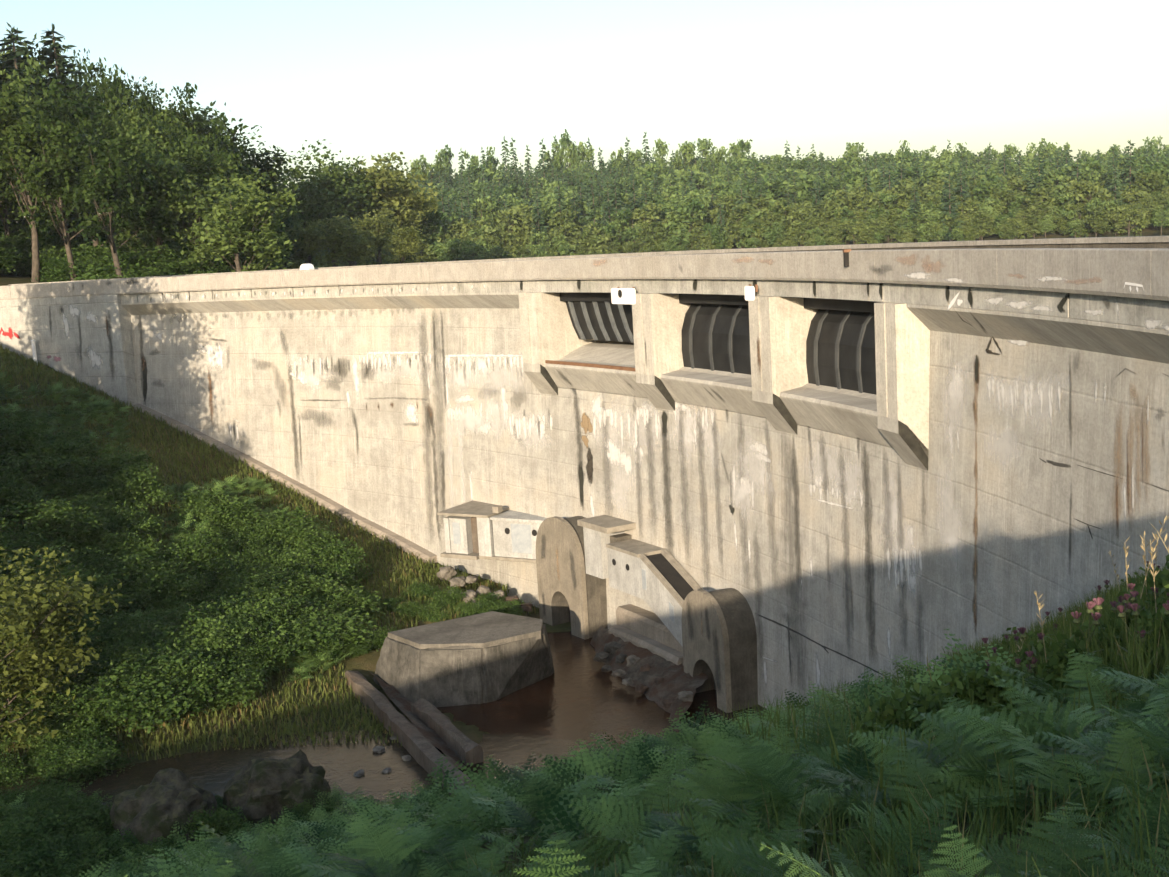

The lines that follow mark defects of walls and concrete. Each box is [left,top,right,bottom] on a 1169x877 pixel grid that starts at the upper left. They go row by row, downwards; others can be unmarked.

water stain [288,316,553,467]
water stain [427,413,445,532]
water stain [729,442,770,560]
water stain [793,431,890,655]
water stain [886,482,922,590]
rust [1116,411,1147,527]